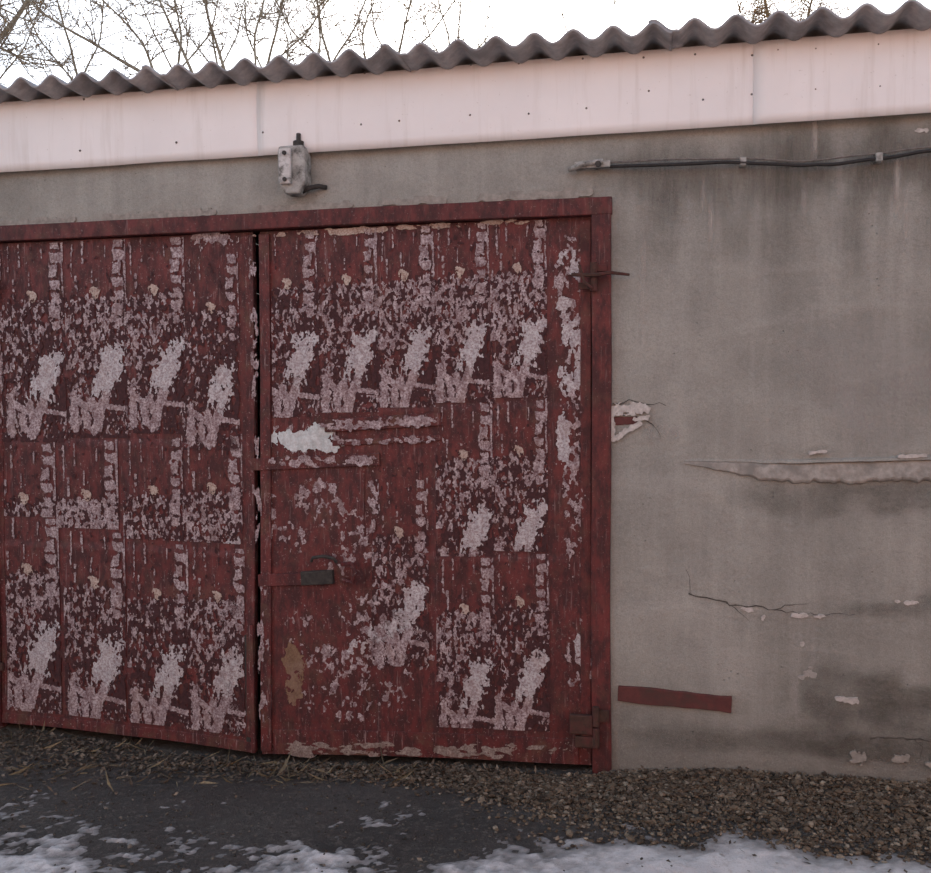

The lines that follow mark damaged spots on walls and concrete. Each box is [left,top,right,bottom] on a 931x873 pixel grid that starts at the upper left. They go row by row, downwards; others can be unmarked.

spalling [611,402,651,442]
peeling [0,233,306,737]
peeling [254,219,586,732]
crack [686,570,854,621]
peeling [564,618,591,692]
peeling [285,740,422,758]
peeling [433,742,569,759]